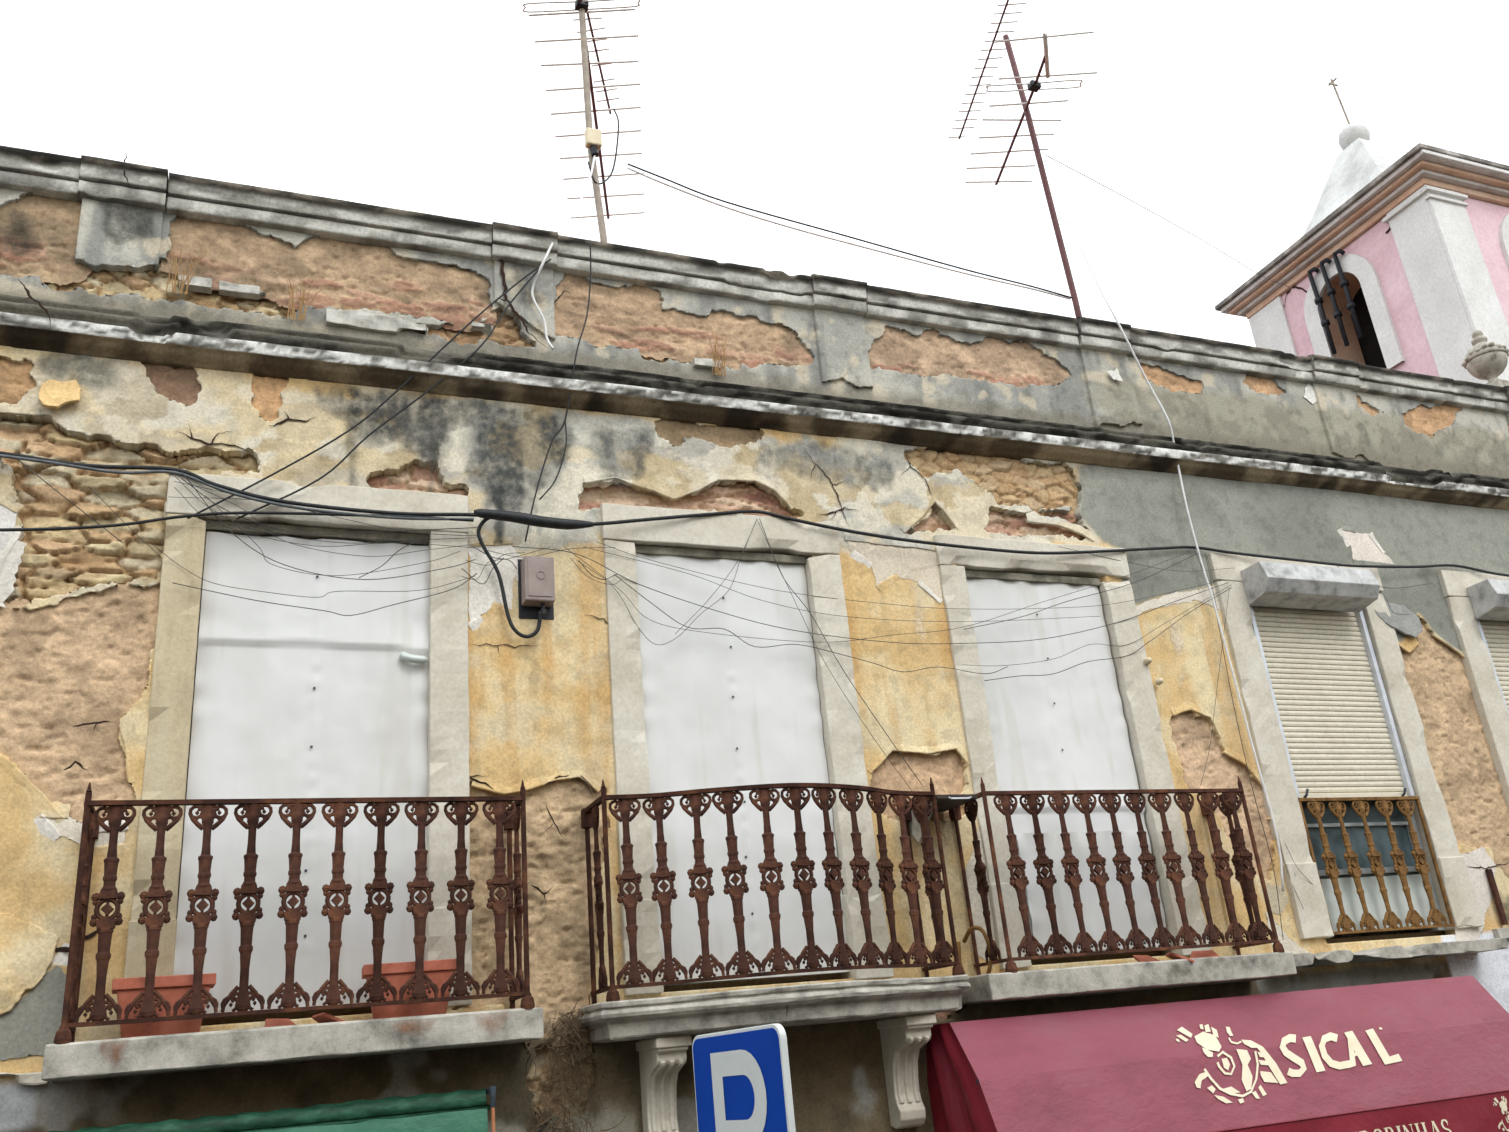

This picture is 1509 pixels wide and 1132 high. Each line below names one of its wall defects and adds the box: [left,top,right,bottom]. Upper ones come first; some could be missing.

spalling [0,195,534,347]
spalling [554,274,814,370]
spalling [868,327,1071,388]
spalling [0,358,259,858]
damp [339,388,569,542]
peeling [468,536,523,631]
damp [600,432,616,477]
damp [633,434,651,474]
spalling [844,450,1095,604]
peeling [1136,586,1221,615]
spalling [1375,602,1509,963]
spalling [452,770,610,1124]